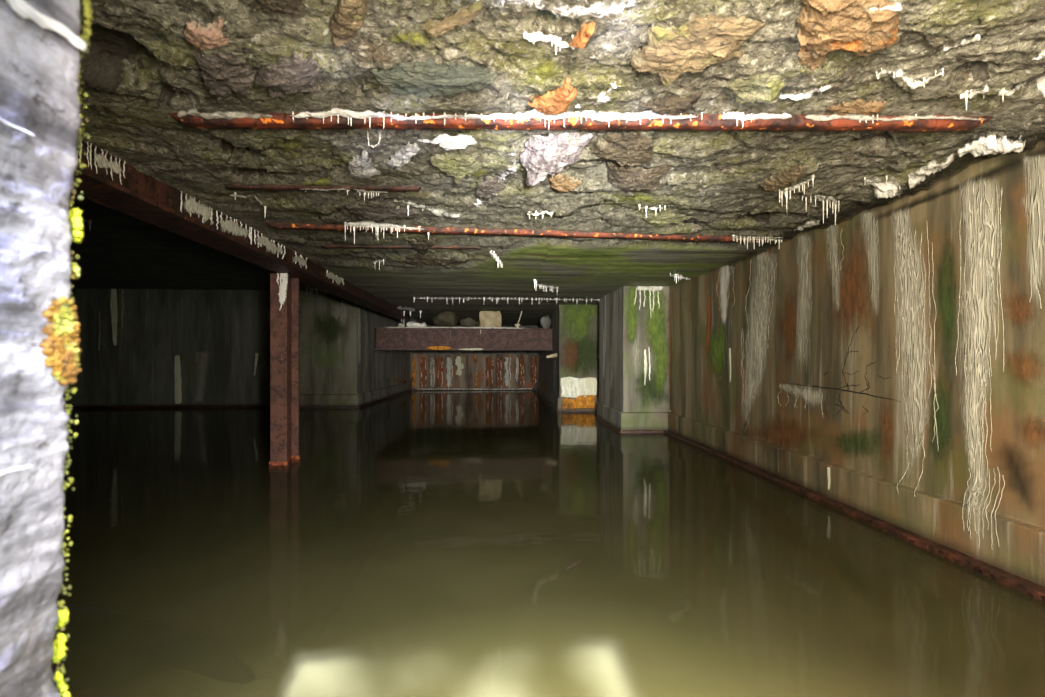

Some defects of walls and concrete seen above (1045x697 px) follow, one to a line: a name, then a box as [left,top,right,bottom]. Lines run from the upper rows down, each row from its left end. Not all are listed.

leakage [290,83,703,150]
leakage [721,112,792,127]
leakage [779,85,832,101]
leakage [876,68,944,90]
leakage [805,75,1045,123]
leakage [79,142,126,185]
corrosion [395,346,452,389]
leakage [386,279,618,398]
leakage [632,327,651,385]
leakage [634,273,690,370]
leakage [716,130,1045,550]